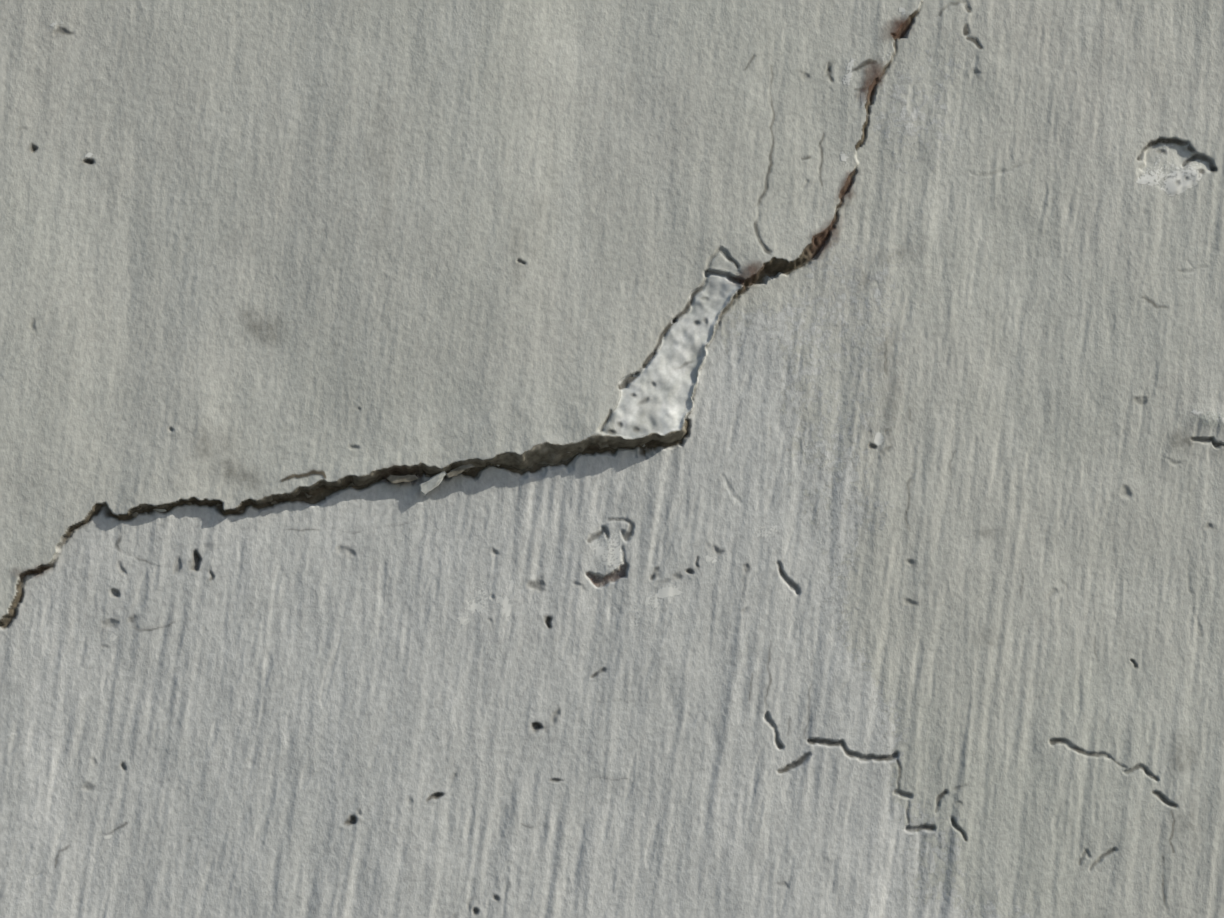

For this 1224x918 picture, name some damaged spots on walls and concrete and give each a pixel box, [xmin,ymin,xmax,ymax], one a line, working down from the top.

crack [964,9,982,49]
crack [723,10,918,312]
spalling [1136,139,1216,196]
crack [0,419,689,628]
peeling [0,211,1038,918]
crack [777,739,900,773]
crack [1050,740,1097,756]
crack [1137,766,1176,807]
crack [920,791,967,841]